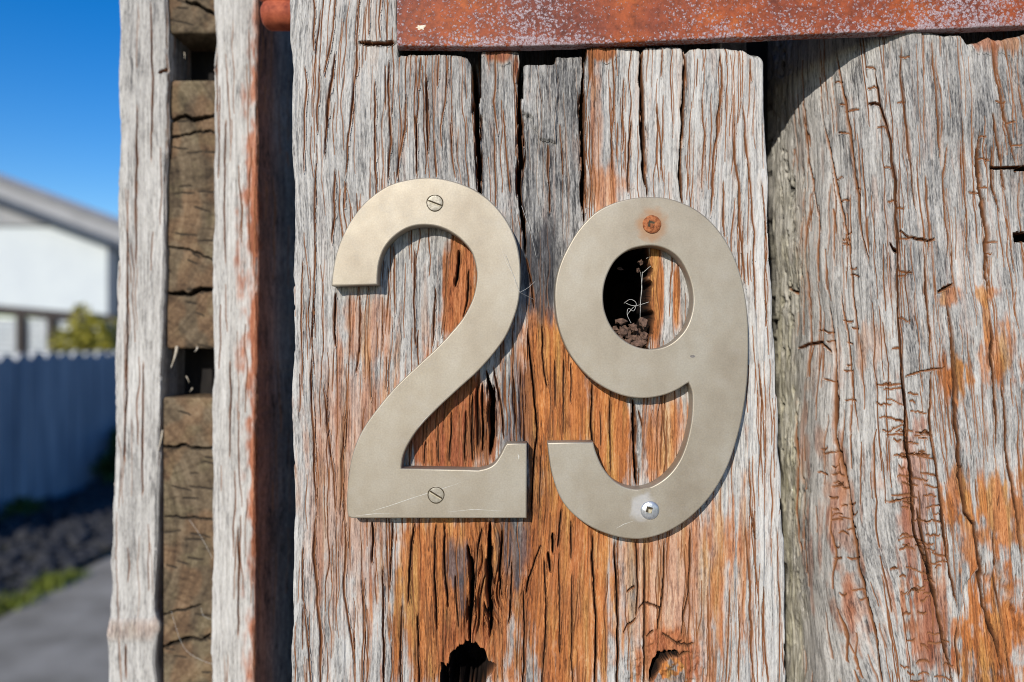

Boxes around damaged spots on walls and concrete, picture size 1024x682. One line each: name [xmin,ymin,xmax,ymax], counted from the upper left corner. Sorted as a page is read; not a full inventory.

crack [300,0,800,682]
rust [633,204,671,243]
crack [725,38,1024,682]